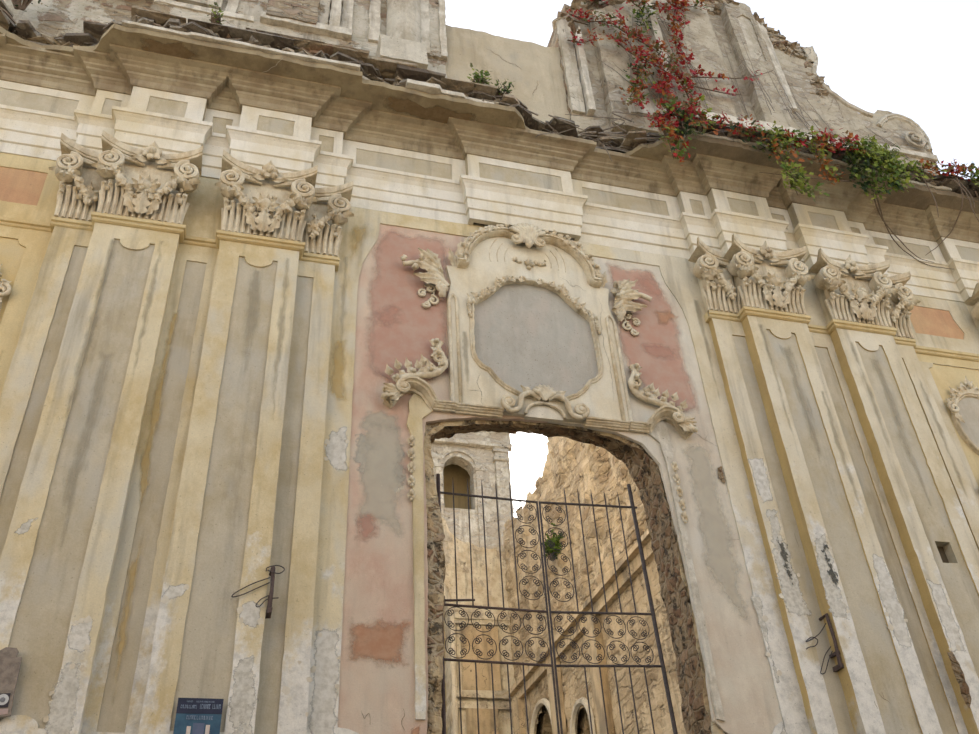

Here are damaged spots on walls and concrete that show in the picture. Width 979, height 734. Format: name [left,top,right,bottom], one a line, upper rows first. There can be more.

damp [141,314,177,494]
peeling [324,427,374,473]
peeling [748,458,811,616]
peeling [813,535,850,618]
peeling [873,554,911,647]